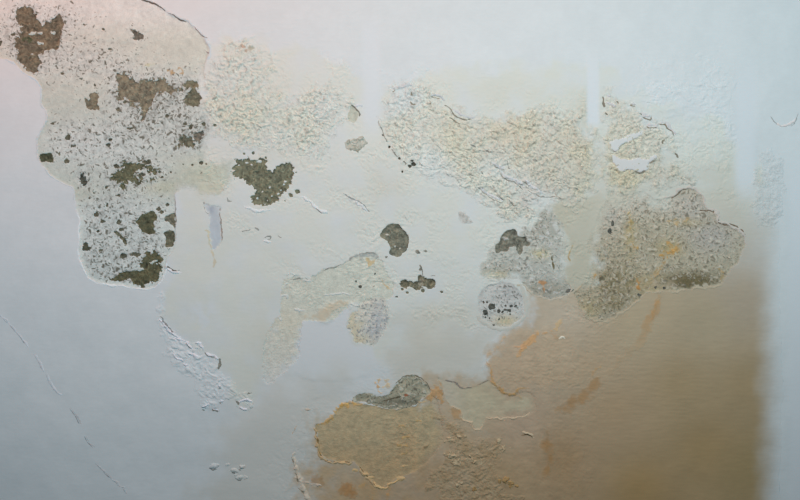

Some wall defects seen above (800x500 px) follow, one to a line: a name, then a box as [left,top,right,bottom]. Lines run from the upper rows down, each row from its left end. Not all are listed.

flaking render [0,0,368,412]
peeling [261,223,443,384]
peeling [314,375,537,500]
water stain [282,183,784,500]
peeling [376,76,747,332]